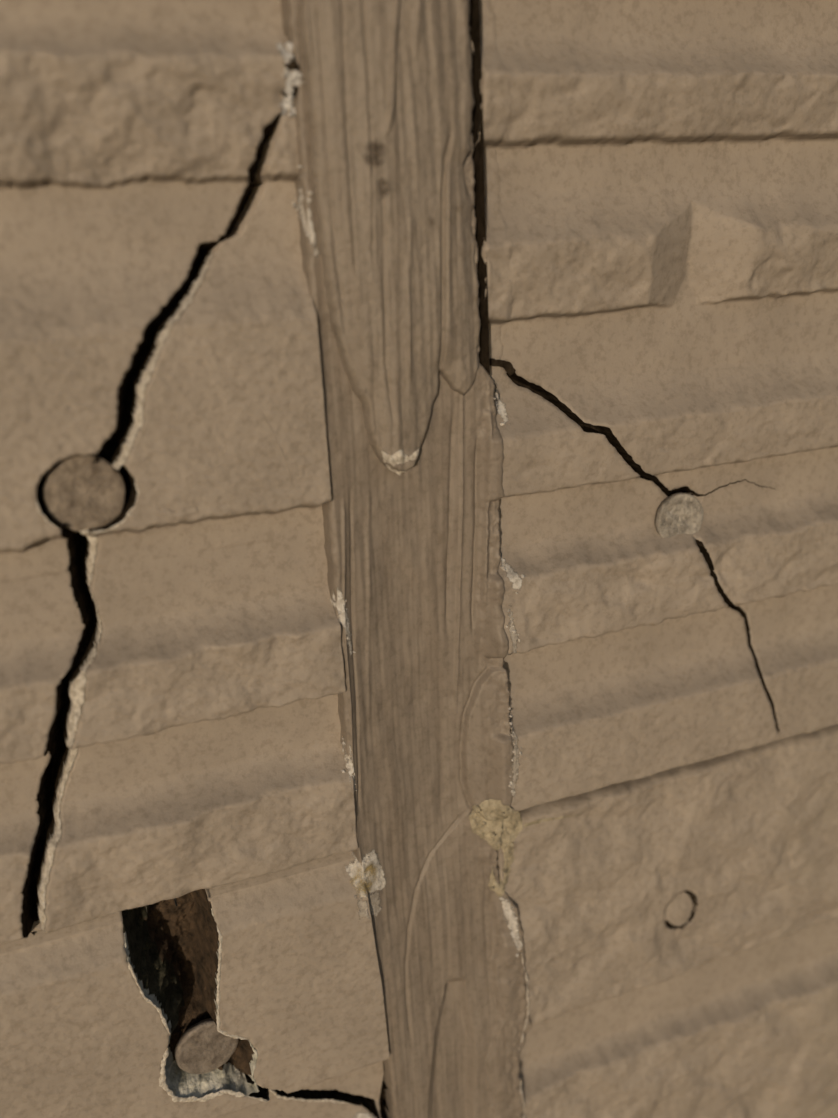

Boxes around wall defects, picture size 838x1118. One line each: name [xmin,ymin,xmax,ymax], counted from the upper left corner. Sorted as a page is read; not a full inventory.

crack [93,33,306,470]
crack [490,358,773,497]
crack [21,522,102,938]
crack [696,539,780,732]
spalling [122,889,259,1102]